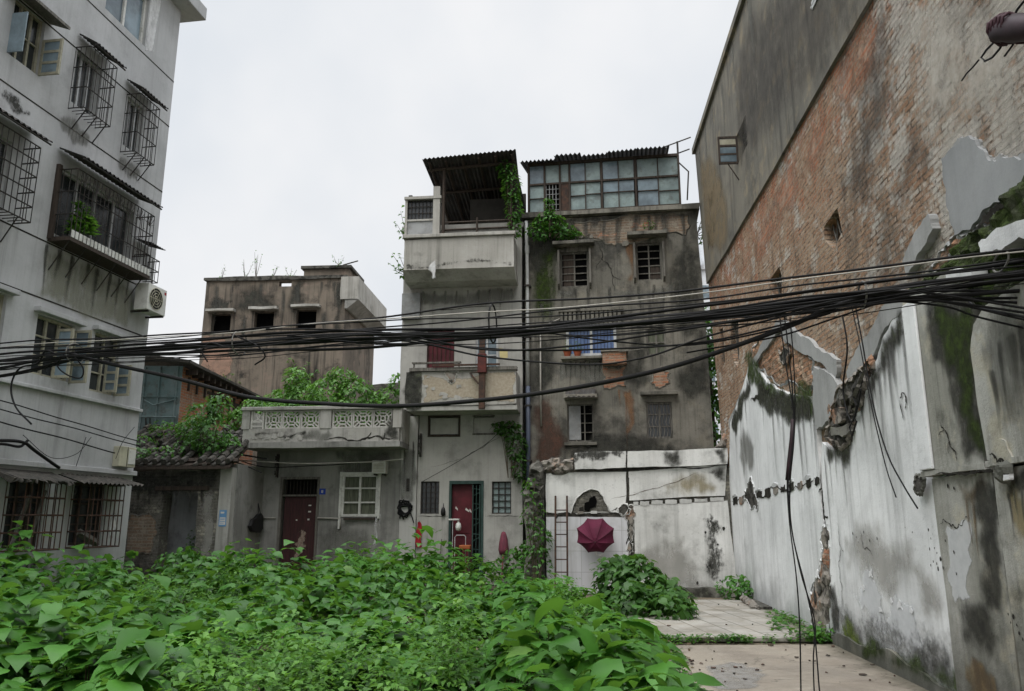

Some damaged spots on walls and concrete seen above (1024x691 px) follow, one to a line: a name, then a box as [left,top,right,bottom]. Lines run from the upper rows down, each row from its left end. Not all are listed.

spalling [571,212,691,246]
spalling [929,191,1024,304]
crack [327,433,393,441]
peeling [422,372,516,403]
spalling [751,334,815,390]
leakage [732,383,851,503]
spalling [824,354,876,452]
leakage [927,297,988,461]
spalling [571,488,636,555]
leakage [705,517,724,579]
spalling [809,523,833,635]
peeling [929,520,972,601]